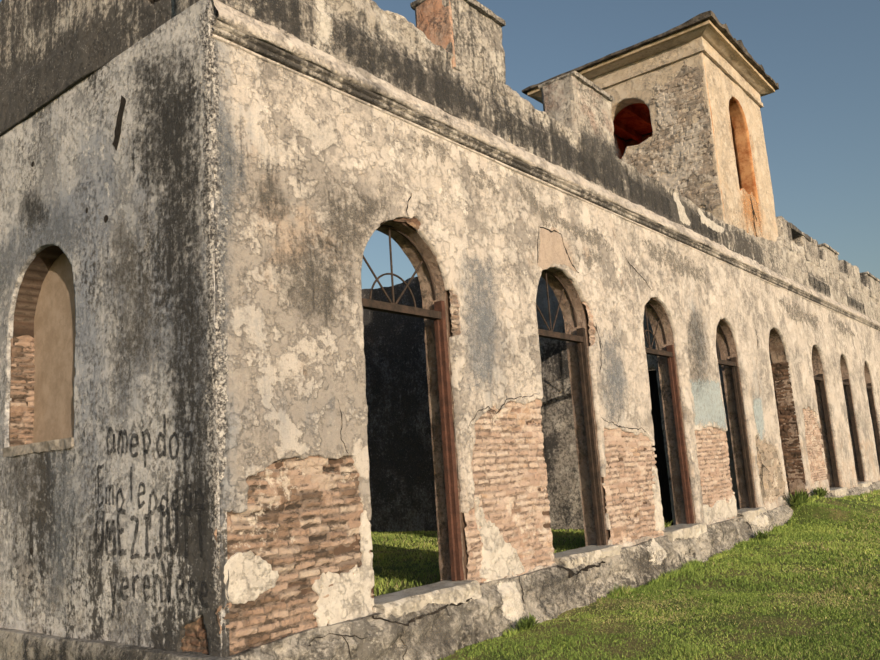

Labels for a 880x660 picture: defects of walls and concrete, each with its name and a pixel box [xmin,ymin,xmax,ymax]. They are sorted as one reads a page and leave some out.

water stain [315,0,481,120]
water stain [259,179,286,219]
peeling [516,183,614,272]
water stain [491,89,671,217]
water stain [111,49,244,528]
spalling [199,0,376,656]
crack [468,392,534,436]
spalling [464,399,555,625]
spalling [602,428,667,566]
spalling [695,426,738,525]
spalling [803,407,827,483]
crack [308,597,472,660]